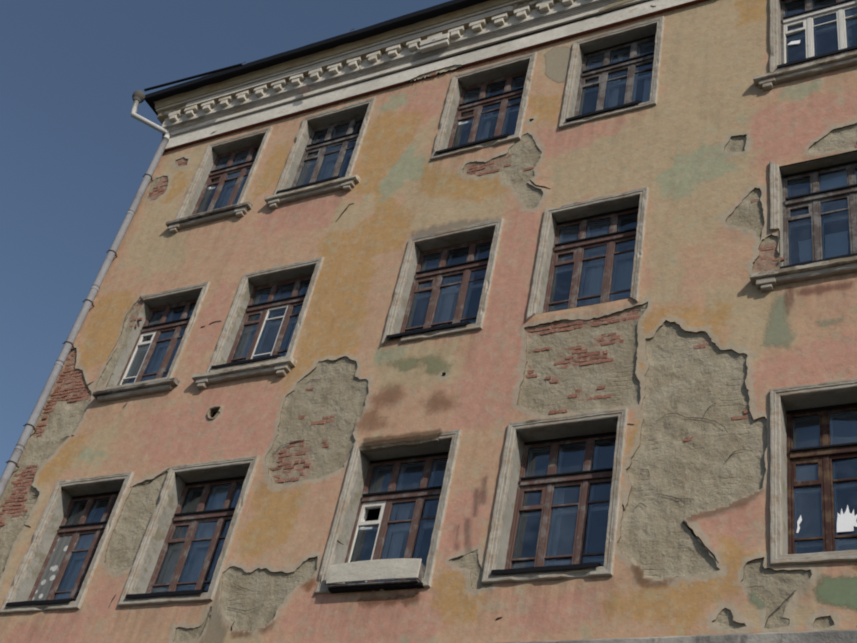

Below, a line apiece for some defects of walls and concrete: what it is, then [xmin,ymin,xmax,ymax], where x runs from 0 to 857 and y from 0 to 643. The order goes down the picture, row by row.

spalling [148,176,168,201]
spalling [462,133,543,209]
spalling [725,187,785,272]
spalling [808,123,857,154]
spalling [0,297,144,578]
spalling [265,356,369,486]
spalling [516,301,768,581]
spalling [104,471,168,574]
spalling [173,556,318,642]
spalling [450,549,492,589]
spalling [741,557,857,629]